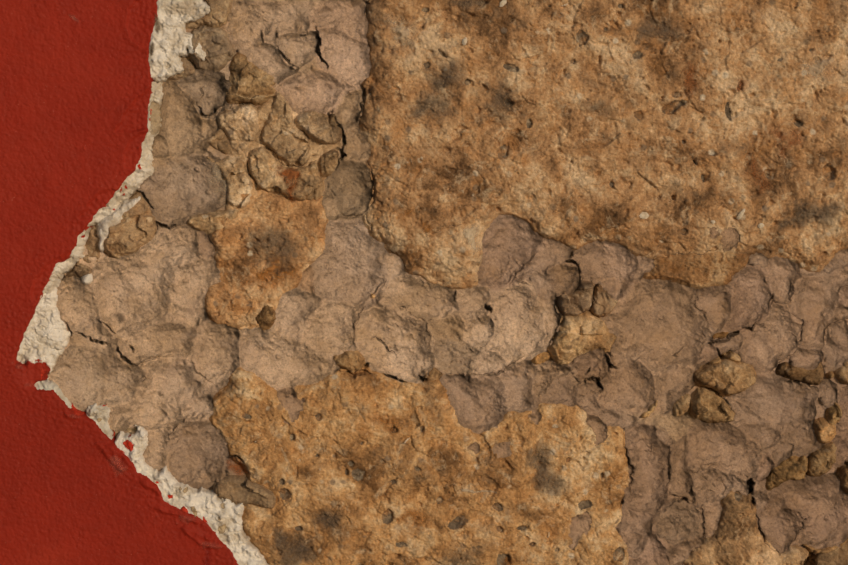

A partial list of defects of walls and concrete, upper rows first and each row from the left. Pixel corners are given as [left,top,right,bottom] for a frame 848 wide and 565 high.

spalling [576,30,589,47]
spalling [662,92,687,115]
flaking render [16,0,269,565]
spalling [278,478,291,501]
spalling [382,508,393,525]
spalling [448,516,468,530]